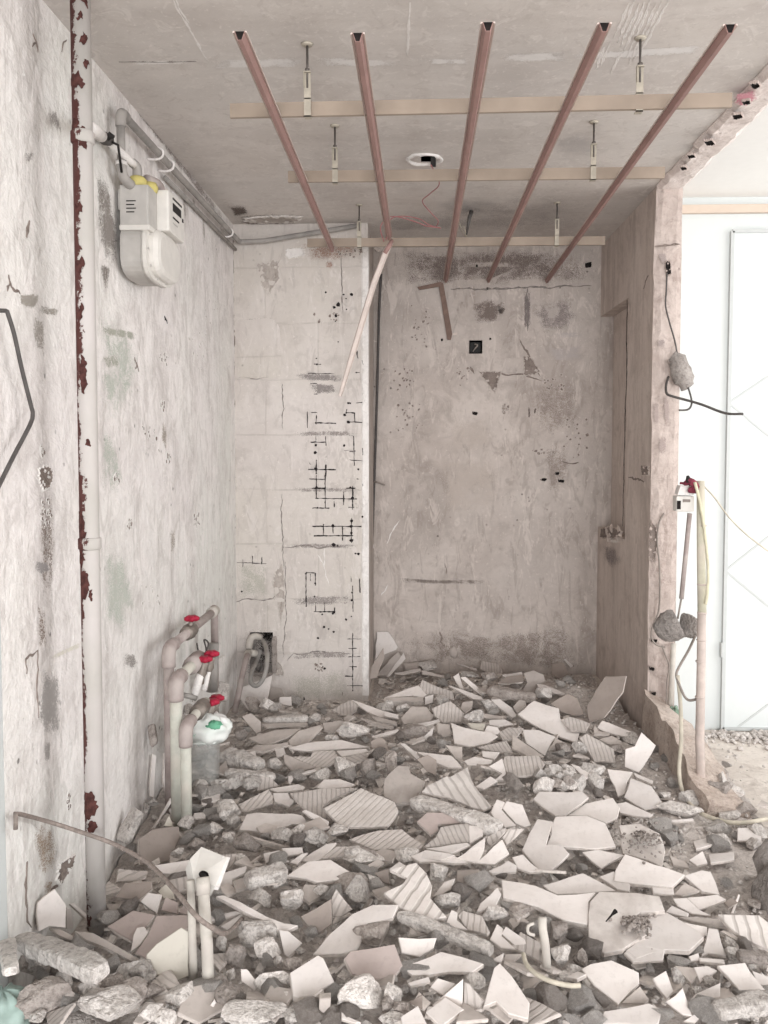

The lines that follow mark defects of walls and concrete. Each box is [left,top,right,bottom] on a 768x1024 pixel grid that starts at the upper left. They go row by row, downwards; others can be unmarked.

corrosion [71,59,89,88]
corrosion [75,256,85,275]
corrosion [79,355,88,394]
spalling [37,444,53,529]
corrosion [79,510,93,601]
crack [236,497,350,659]
corrosion [84,791,99,833]